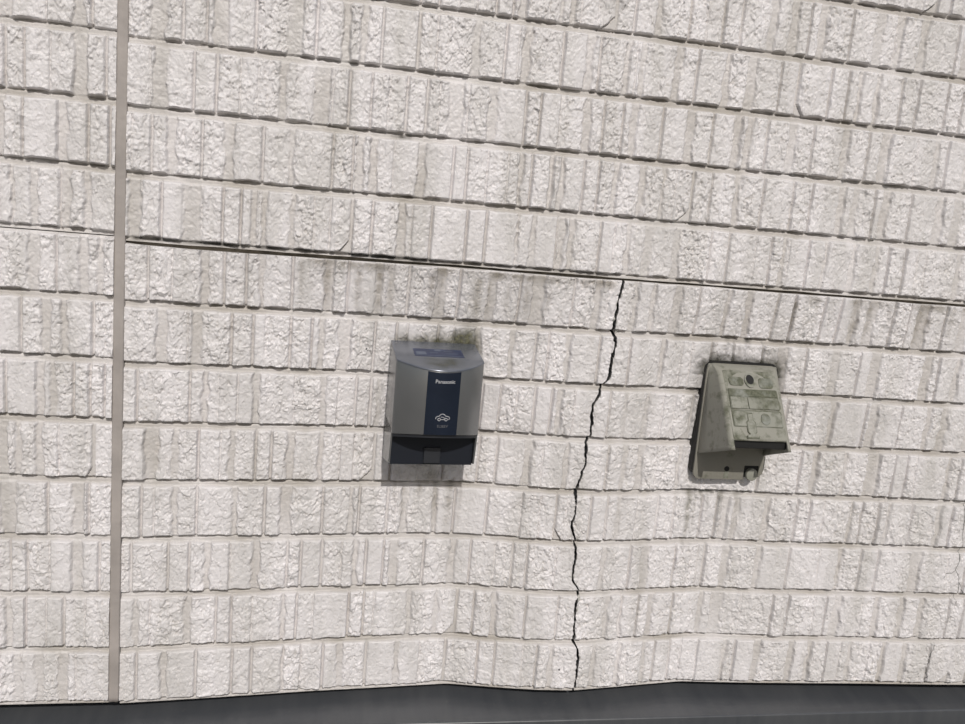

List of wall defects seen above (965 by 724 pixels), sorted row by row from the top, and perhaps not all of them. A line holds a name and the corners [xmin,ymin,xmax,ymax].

crack [570,280,625,686]